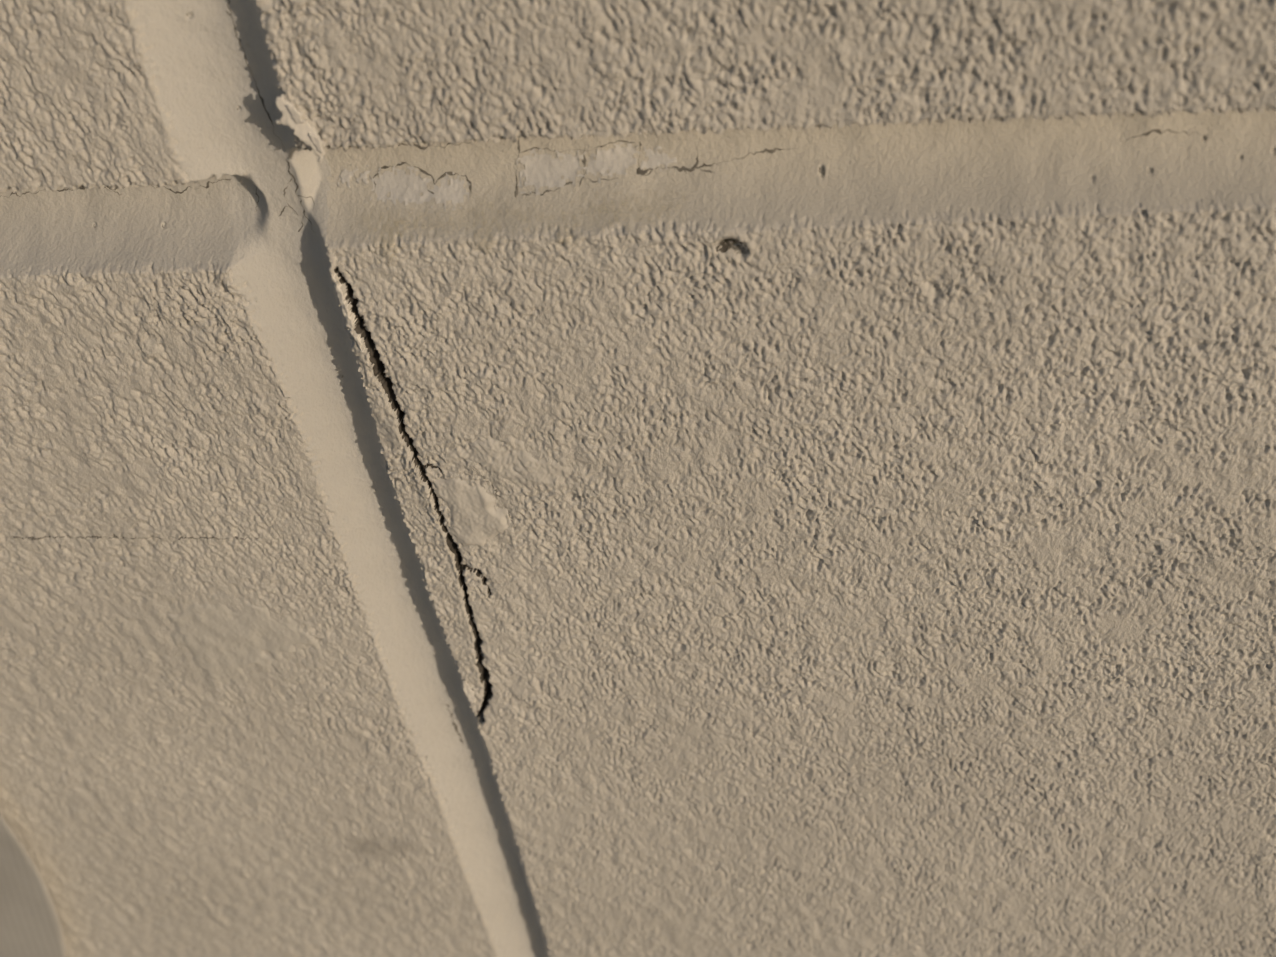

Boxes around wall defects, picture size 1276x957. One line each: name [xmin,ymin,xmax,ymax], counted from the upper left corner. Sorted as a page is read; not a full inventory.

peeling [275,94,326,162]
crack [334,268,493,745]